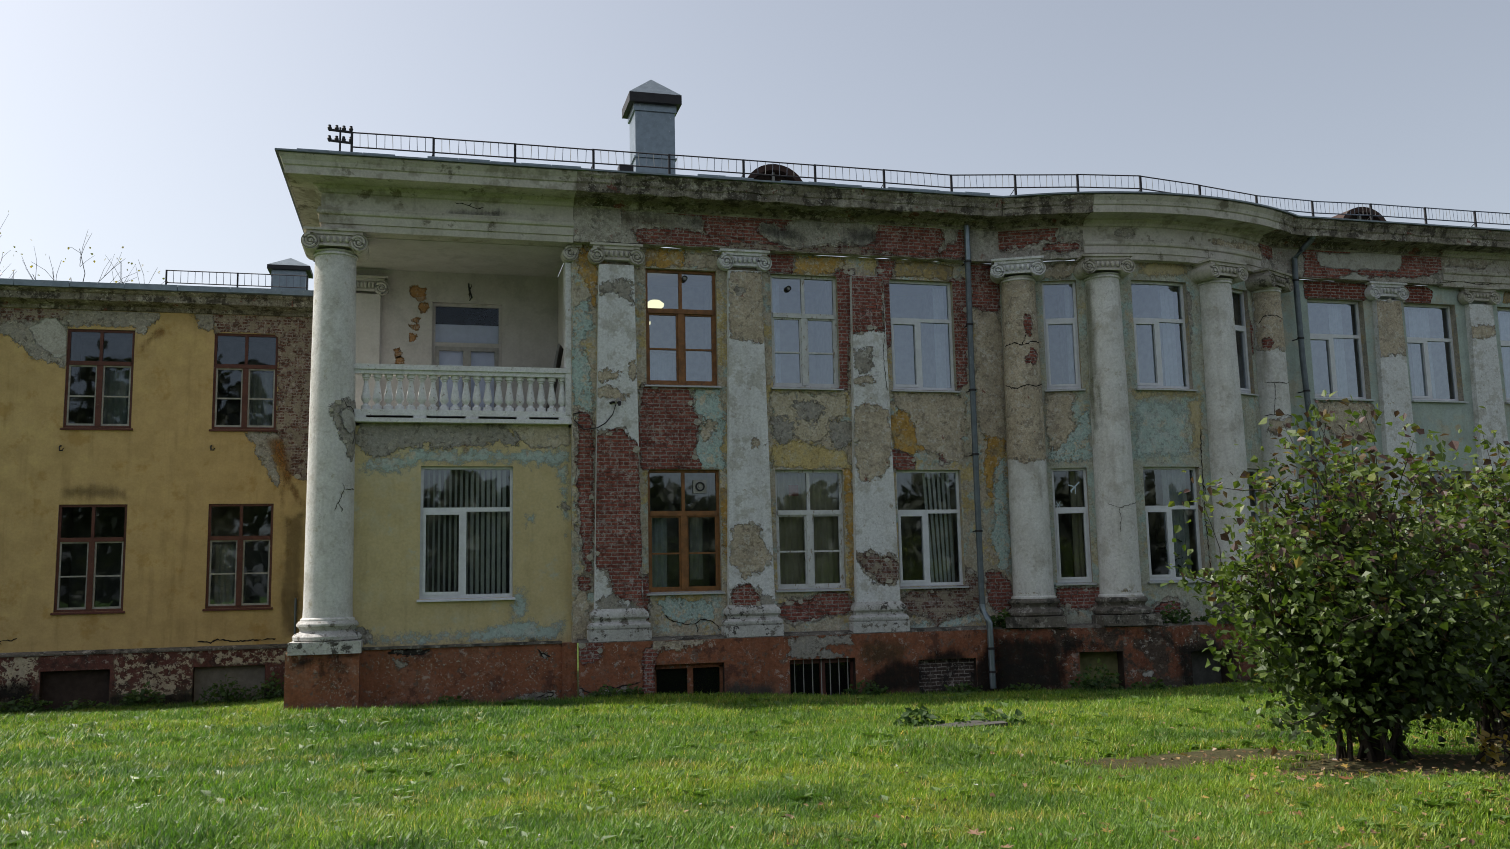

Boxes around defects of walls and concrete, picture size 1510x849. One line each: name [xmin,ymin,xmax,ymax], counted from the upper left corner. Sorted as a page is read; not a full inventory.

spalling [0,308,161,369]
spalling [1302,250,1496,358]
spalling [194,314,313,488]
spalling [328,213,1100,702]
peeling [0,657,39,687]
peeling [114,648,287,695]